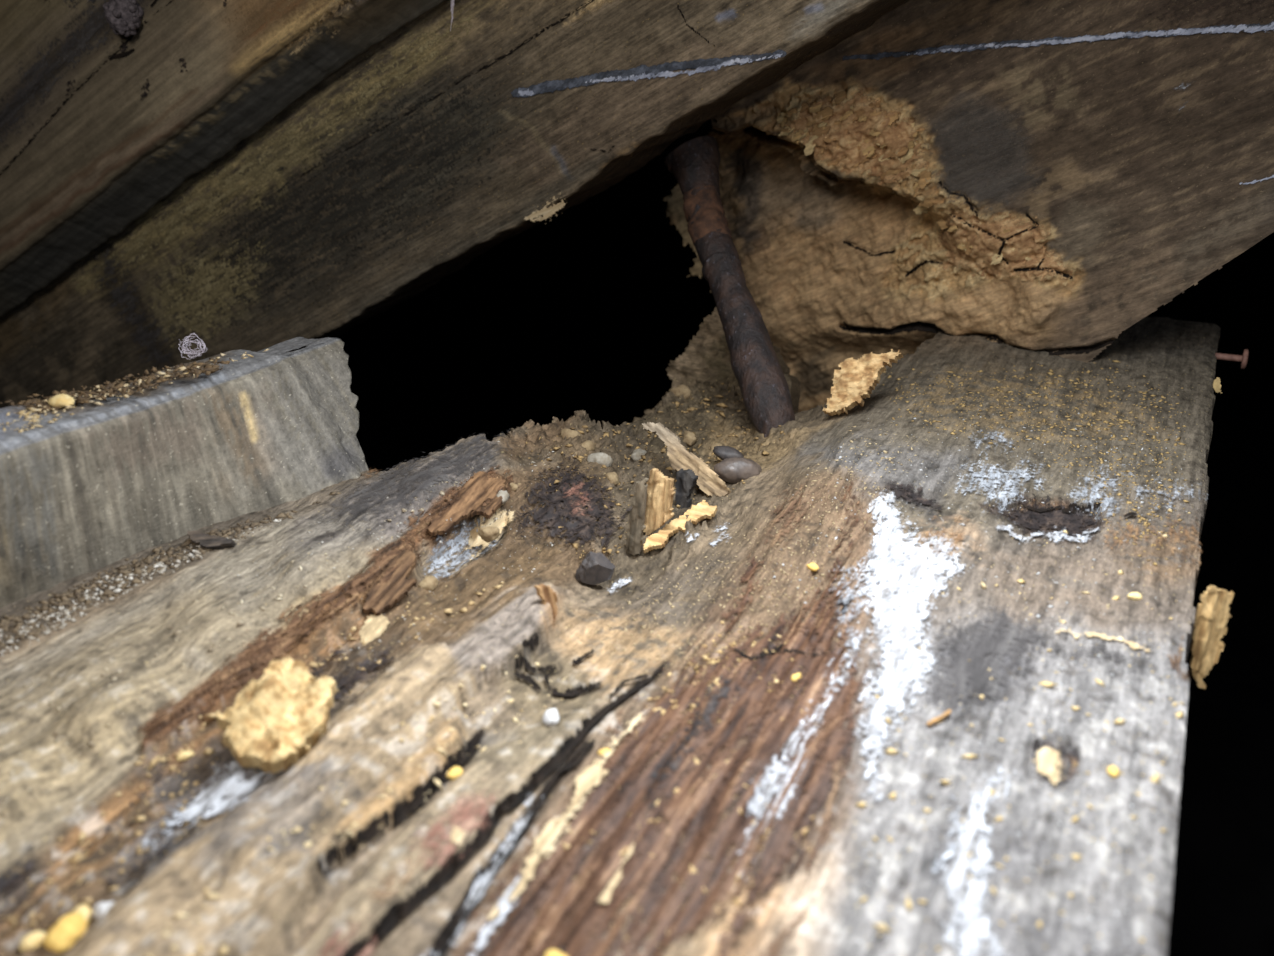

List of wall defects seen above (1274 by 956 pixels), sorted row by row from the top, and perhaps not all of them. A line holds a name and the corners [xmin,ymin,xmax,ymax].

crack [843,241,943,277]
crack [938,181,1073,279]
water stain [956,432,1200,543]
crack [314,729,484,883]
crack [342,633,664,956]
water stain [718,490,1124,956]